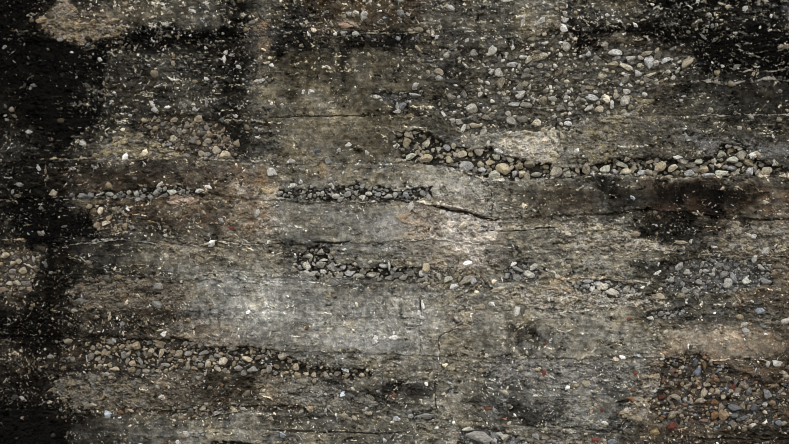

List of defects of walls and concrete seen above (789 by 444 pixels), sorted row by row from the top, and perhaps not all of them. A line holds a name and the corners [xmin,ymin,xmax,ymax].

crack [433,182,552,233]
water stain [0,196,101,357]
water stain [0,406,66,444]